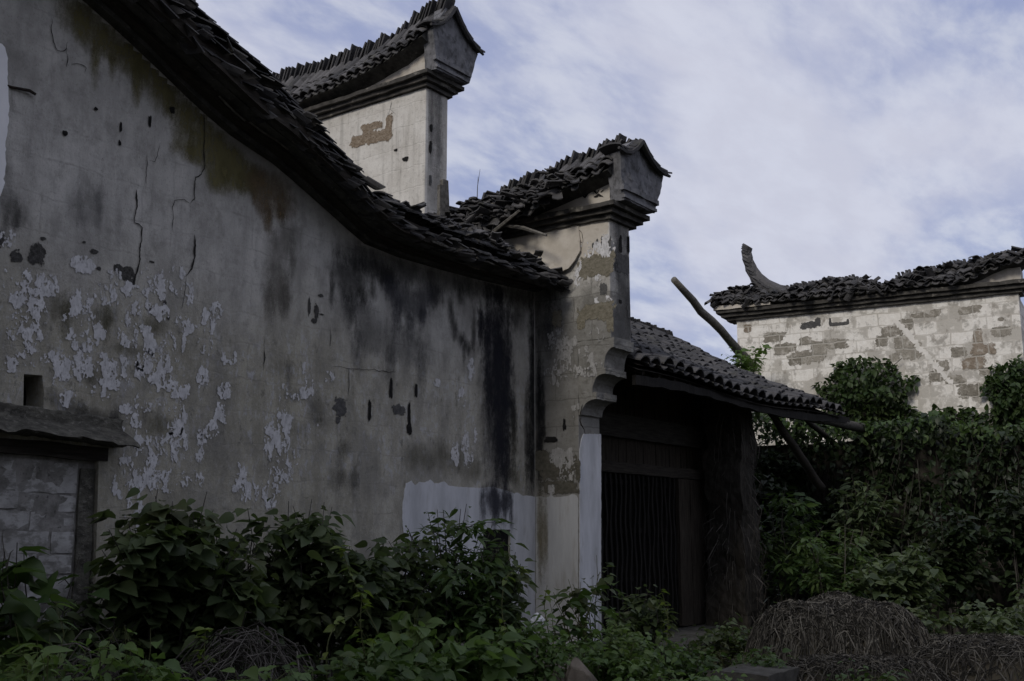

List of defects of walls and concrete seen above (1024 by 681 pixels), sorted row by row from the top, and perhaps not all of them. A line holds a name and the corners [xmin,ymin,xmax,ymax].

spalling [349,113,408,161]
crack [133,146,160,284]
crack [172,117,205,307]
flaking render [0,229,237,530]
flaking render [232,362,335,510]
leakage [331,247,551,525]
spalling [535,403,581,495]
flaking render [511,225,631,387]
spalling [763,317,849,366]
spalling [875,309,941,362]
spalling [958,305,982,315]
spalling [928,317,1013,399]